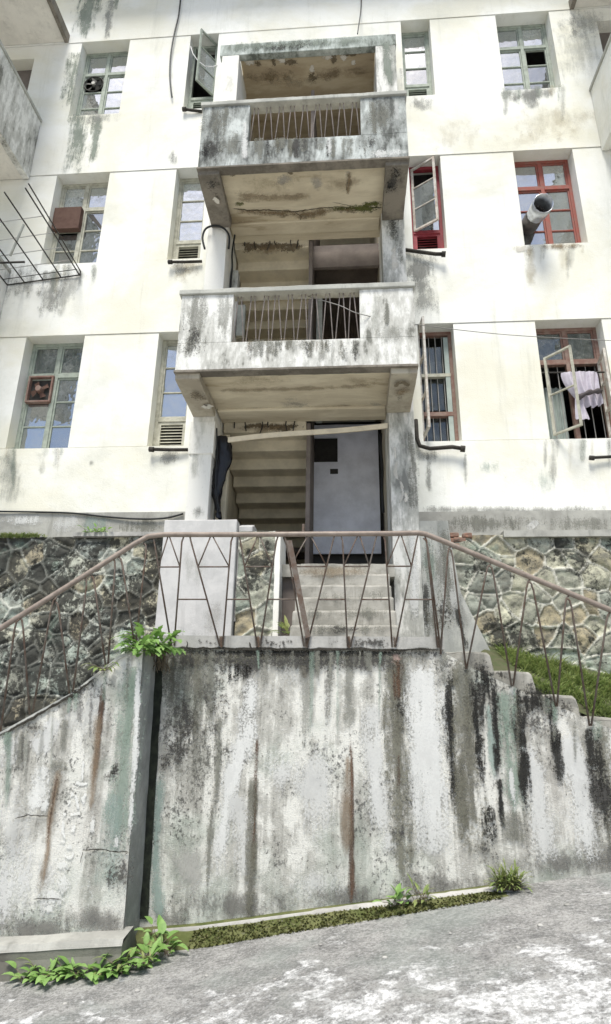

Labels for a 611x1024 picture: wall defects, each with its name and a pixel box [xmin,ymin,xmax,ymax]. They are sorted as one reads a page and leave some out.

damp [77,0,119,38]
damp [66,115,109,166]
damp [199,102,405,192]
spalling [241,240,303,254]
crack [234,202,381,220]
damp [183,328,206,355]
rust [343,636,355,727]
rust [90,687,105,808]
damp [160,591,611,925]
rust [40,771,60,885]
crack [80,849,127,862]
rust [340,741,356,901]